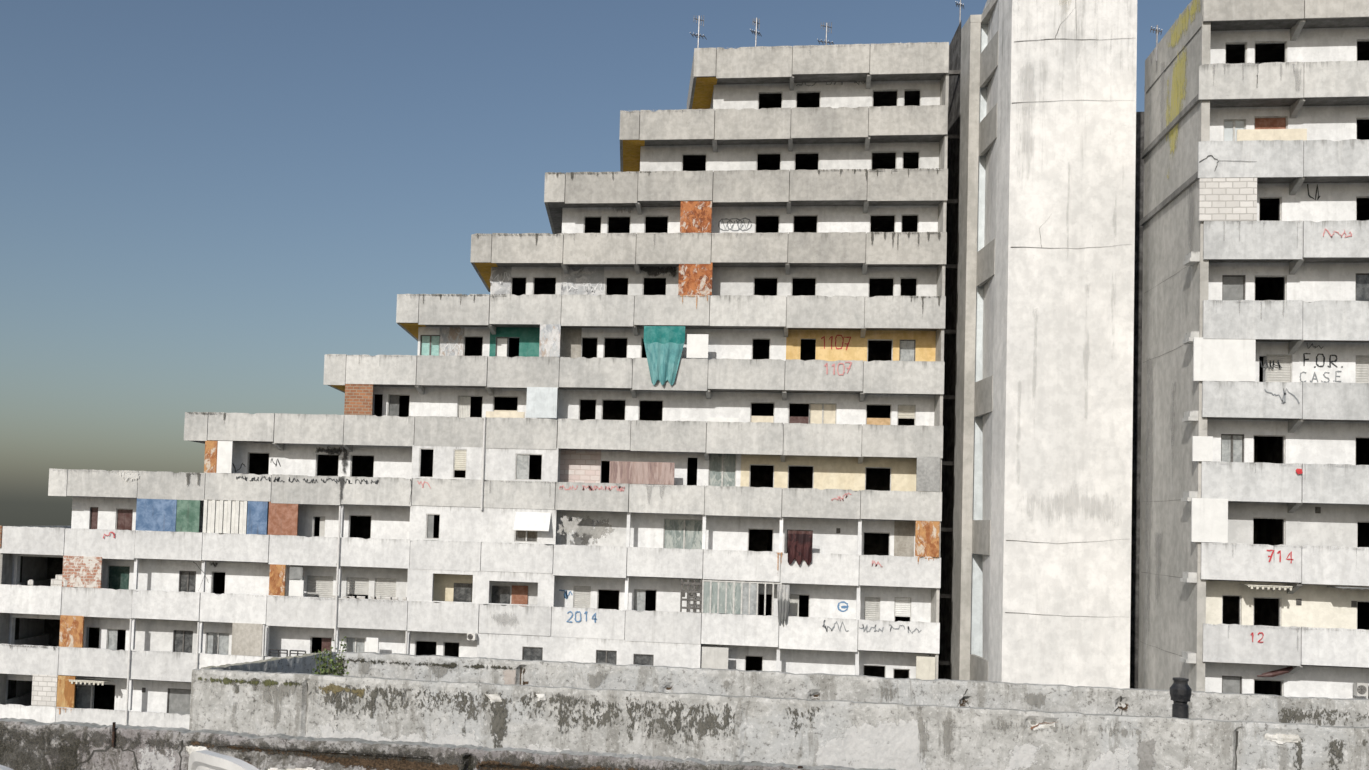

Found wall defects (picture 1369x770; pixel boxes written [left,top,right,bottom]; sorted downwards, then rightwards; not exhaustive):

corrosion [678,262,713,309]
corrosion [915,521,940,562]
water stain [232,679,289,727]
water stain [315,682,489,735]
water stain [522,693,735,744]